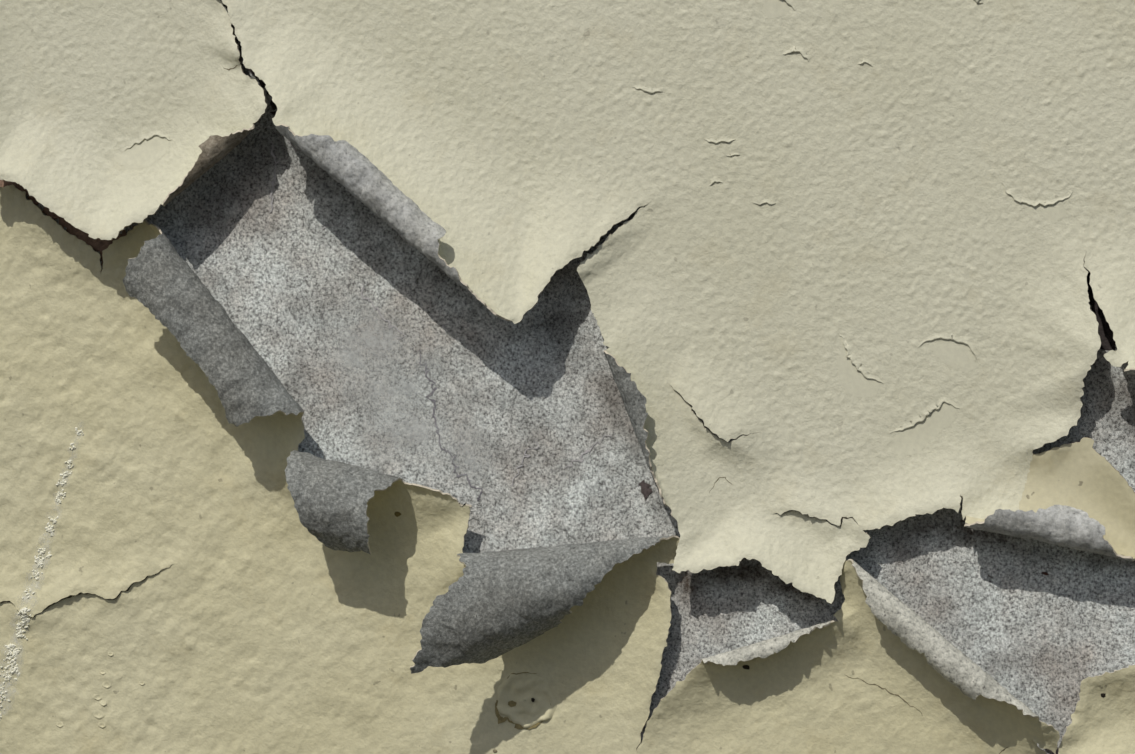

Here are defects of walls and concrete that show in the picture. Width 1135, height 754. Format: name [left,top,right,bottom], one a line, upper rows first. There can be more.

peeling [1001,182,1072,224]
crack [1087,270,1116,351]
peeling [114,108,680,674]
peeling [837,333,884,398]
peeling [917,332,980,374]
peeling [848,345,1135,748]
peeling [641,558,845,740]